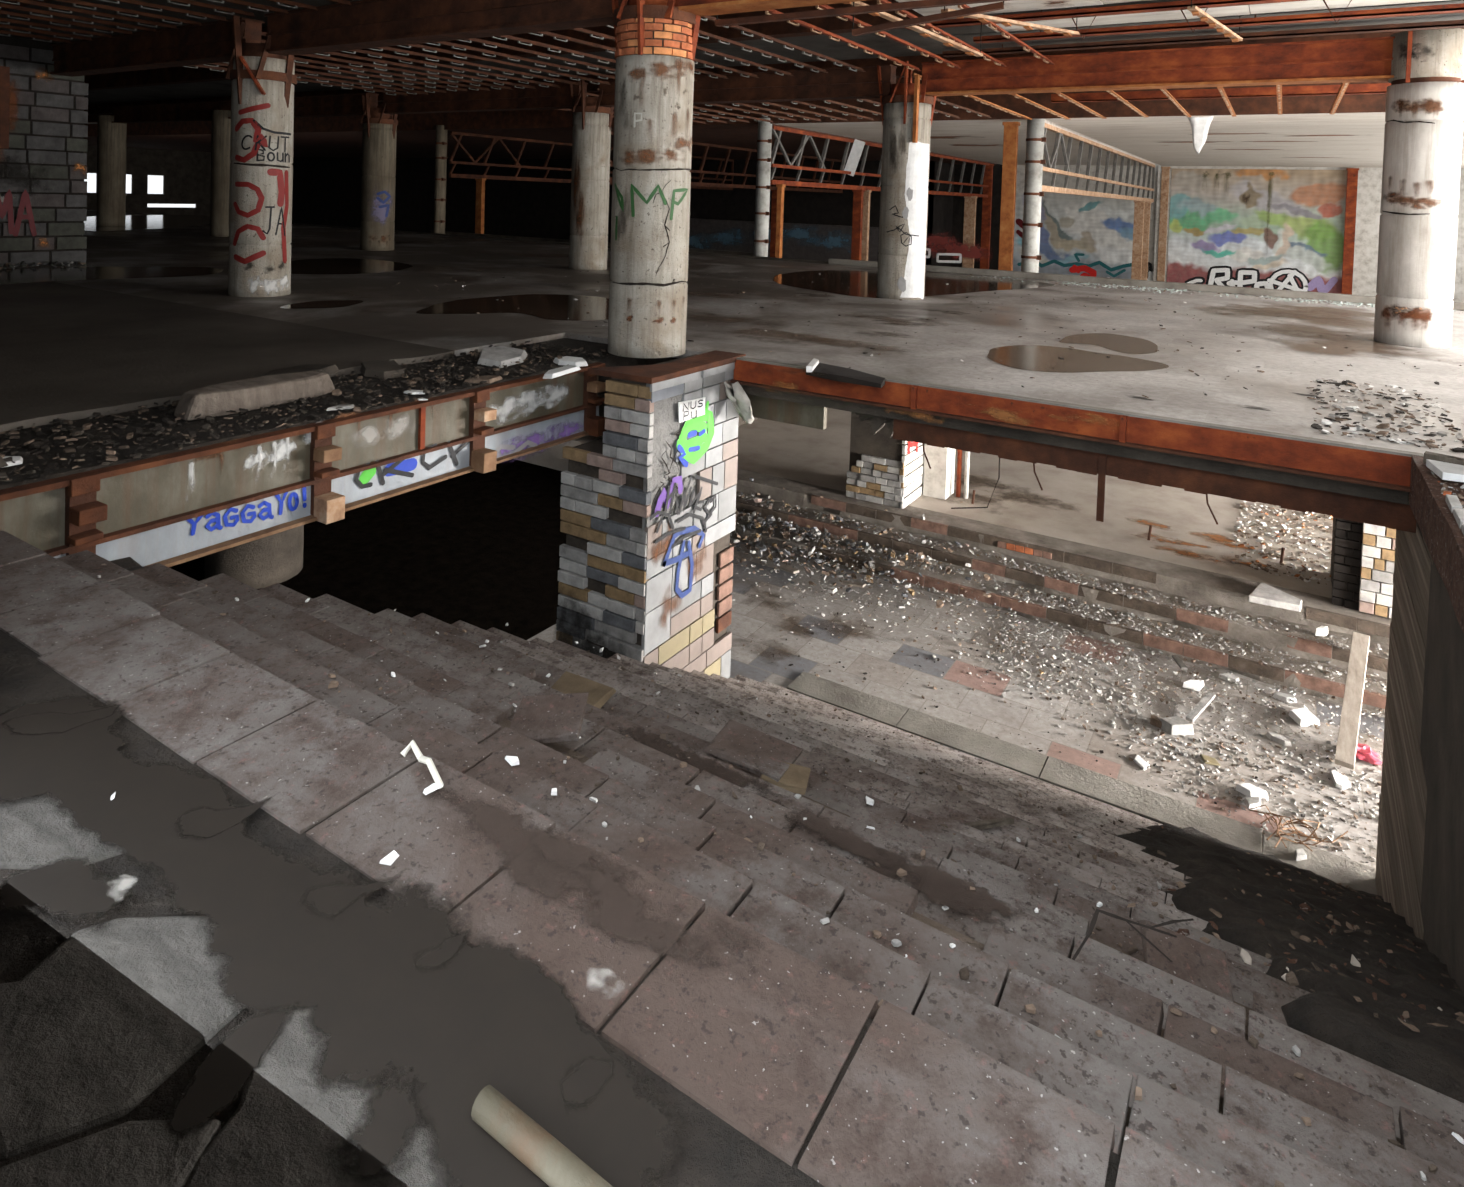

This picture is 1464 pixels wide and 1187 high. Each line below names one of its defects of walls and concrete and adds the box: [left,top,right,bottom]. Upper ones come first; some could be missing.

rust [1393,100,1443,112]
crack [1387,117,1435,125]
rust [1384,177,1437,209]
crack [1383,209,1424,217]
rust [1381,306,1432,328]
crack [1072,908,1194,962]